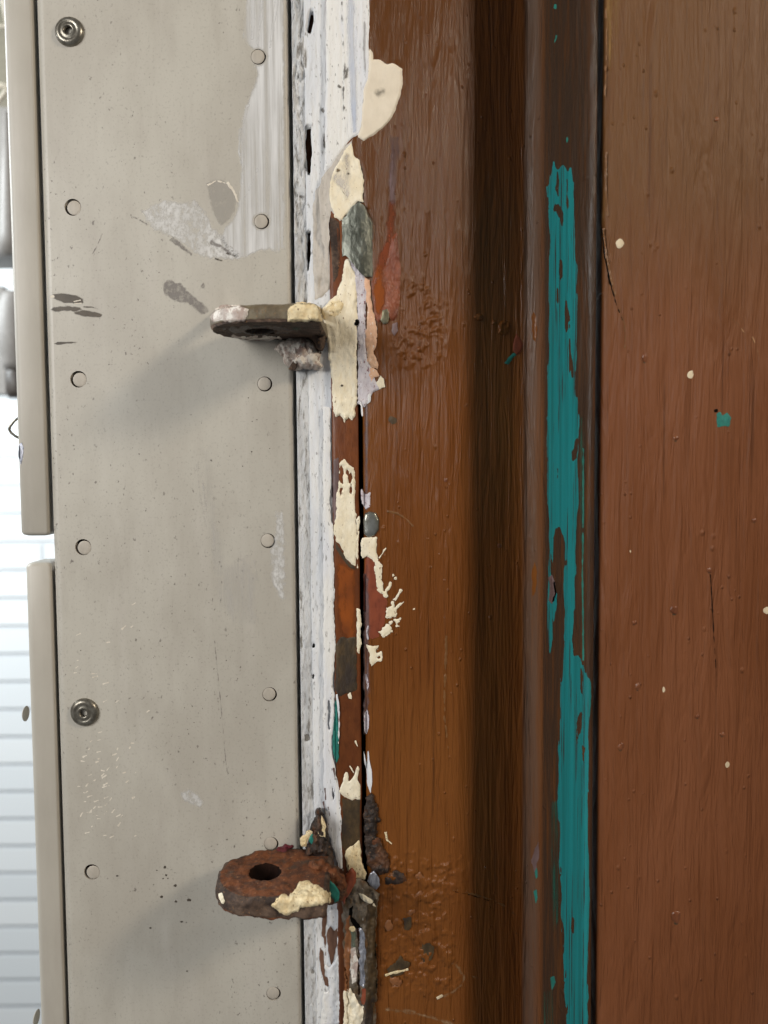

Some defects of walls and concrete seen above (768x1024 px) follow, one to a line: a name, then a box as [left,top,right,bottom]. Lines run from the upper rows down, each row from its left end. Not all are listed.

flaking render [287,49,403,323]
peeling [358,368,385,416]
peeling [335,556,388,696]
peeling [300,816,326,847]
peeling [341,798,360,850]
peeling [368,871,380,890]
peeling [271,880,362,1024]